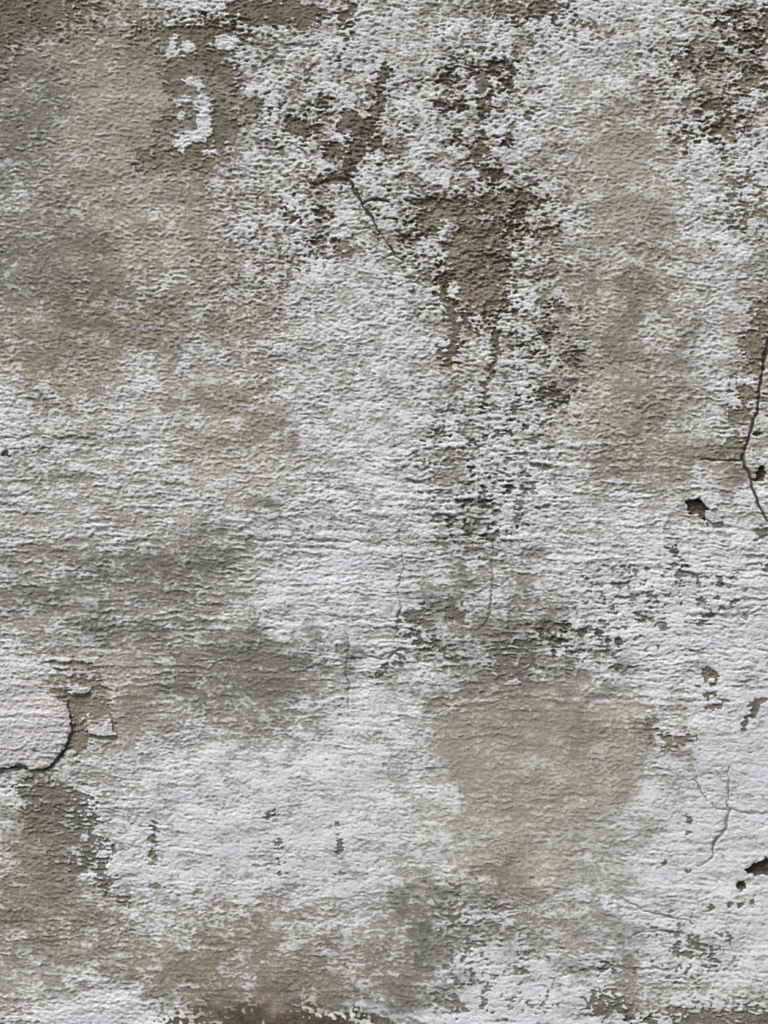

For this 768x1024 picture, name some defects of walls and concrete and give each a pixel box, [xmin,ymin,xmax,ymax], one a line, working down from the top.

crack [294,177,404,261]
peeling [120,0,617,552]
crack [702,340,768,522]
spalling [685,497,723,526]
peeling [44,653,118,763]
peeling [643,722,701,753]
peeling [695,667,730,710]
peeling [740,698,768,732]
leakage [447,697,655,889]
crack [658,766,768,867]
leakage [427,884,487,907]
spalling [706,858,768,911]